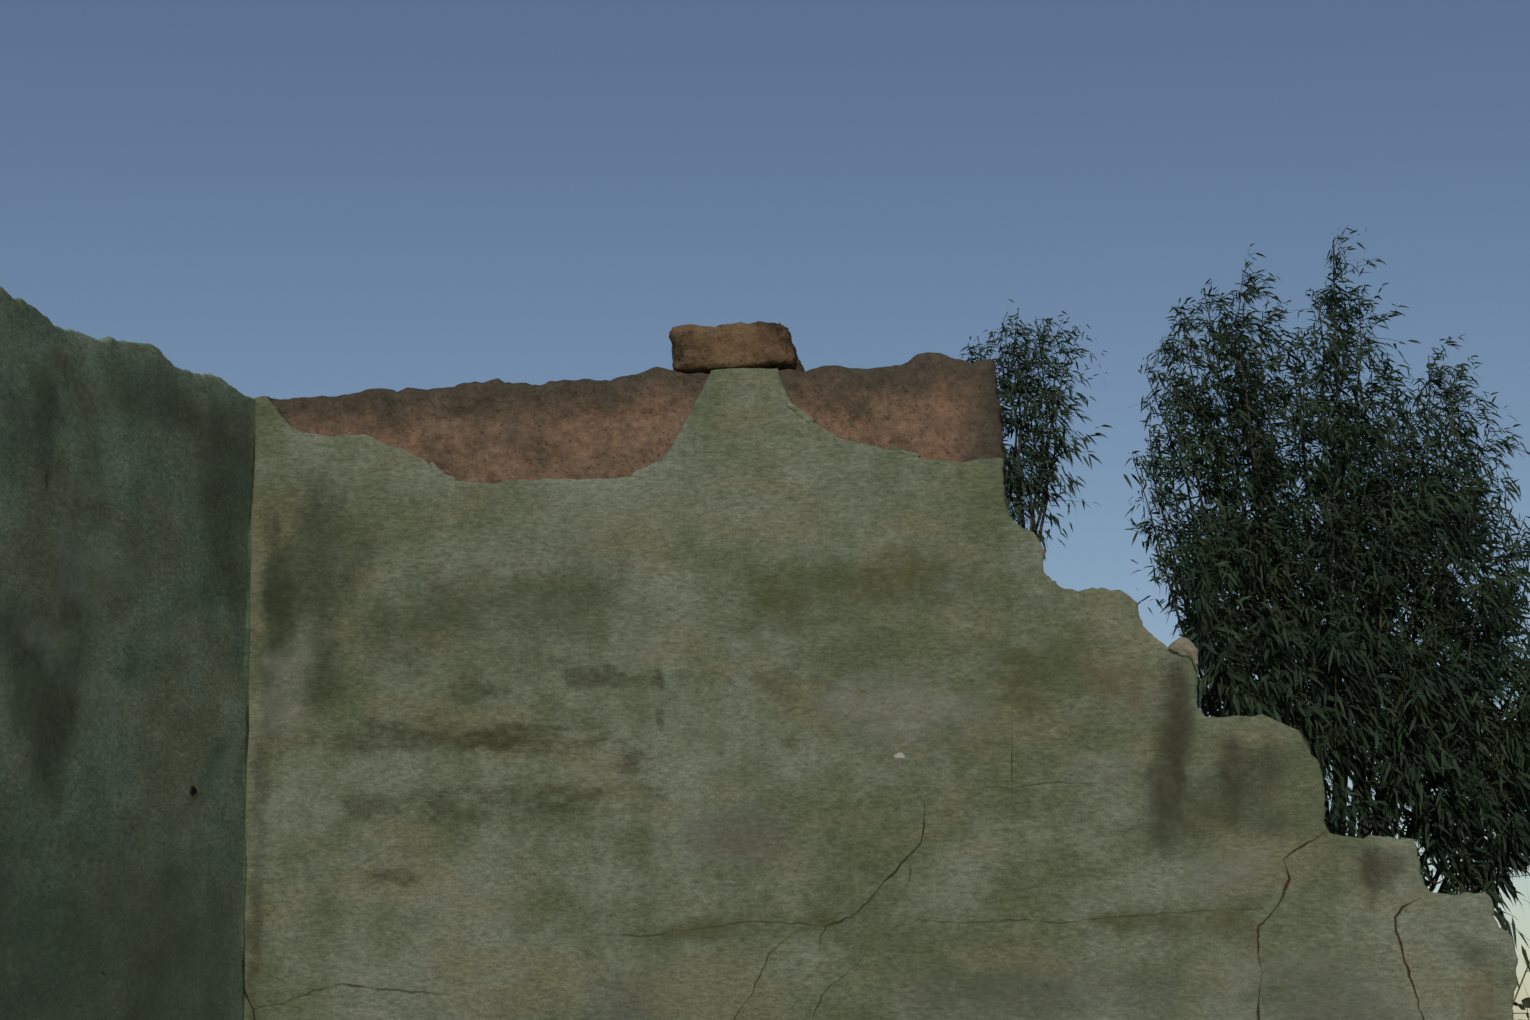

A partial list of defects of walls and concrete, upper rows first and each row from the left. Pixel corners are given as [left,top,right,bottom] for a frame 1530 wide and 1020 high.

spalling [271,367,710,484]
spalling [778,352,1006,484]
crack [244,983,421,1020]
crack [734,806,925,1020]
crack [1257,841,1309,1020]
crack [1394,897,1424,1020]